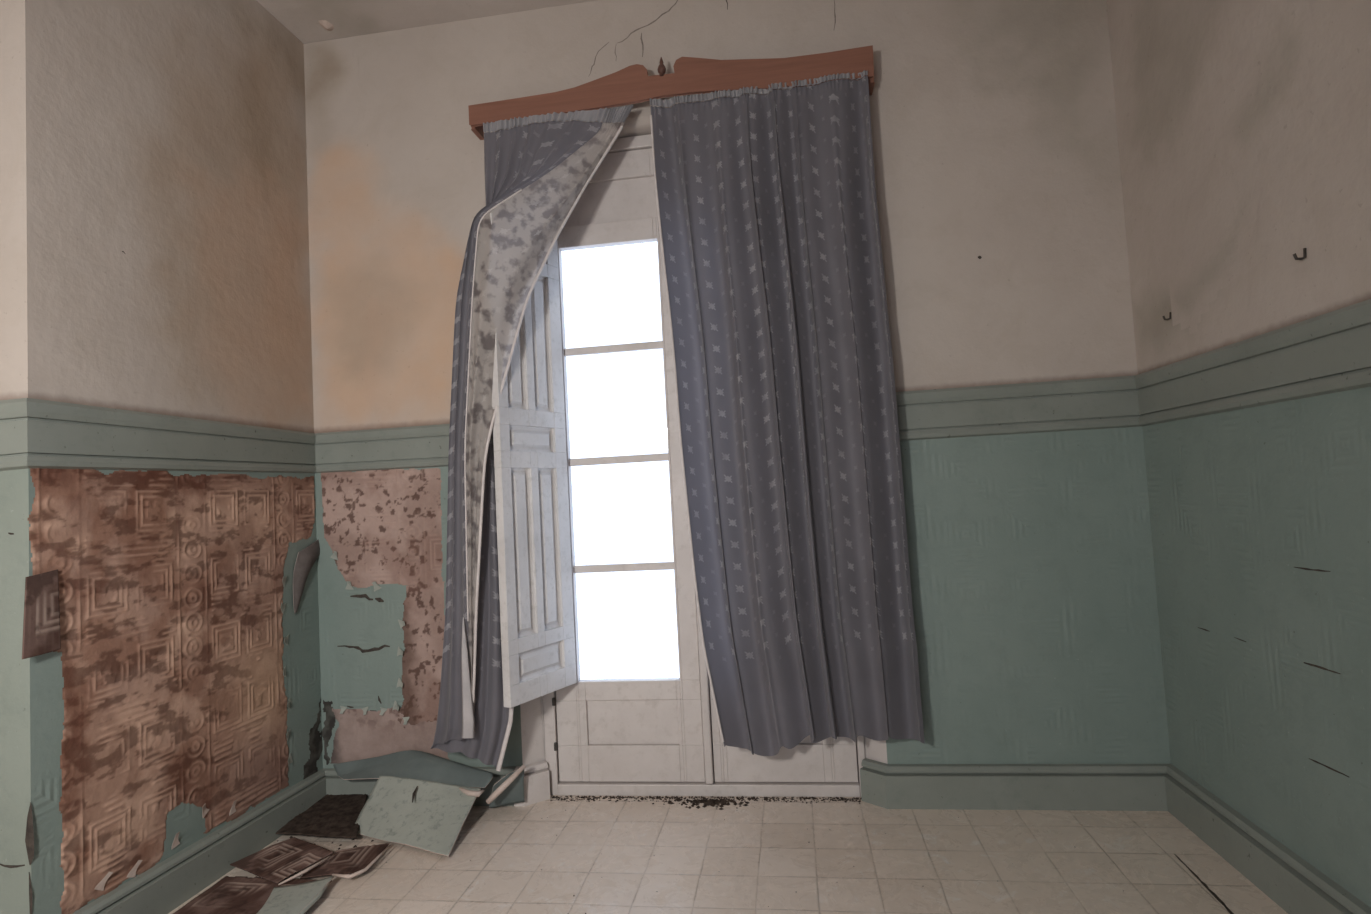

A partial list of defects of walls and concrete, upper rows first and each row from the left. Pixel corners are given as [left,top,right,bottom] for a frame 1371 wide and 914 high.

crack [588,0,678,77]
peeling [27,468,450,914]
crack [1174,854,1234,914]